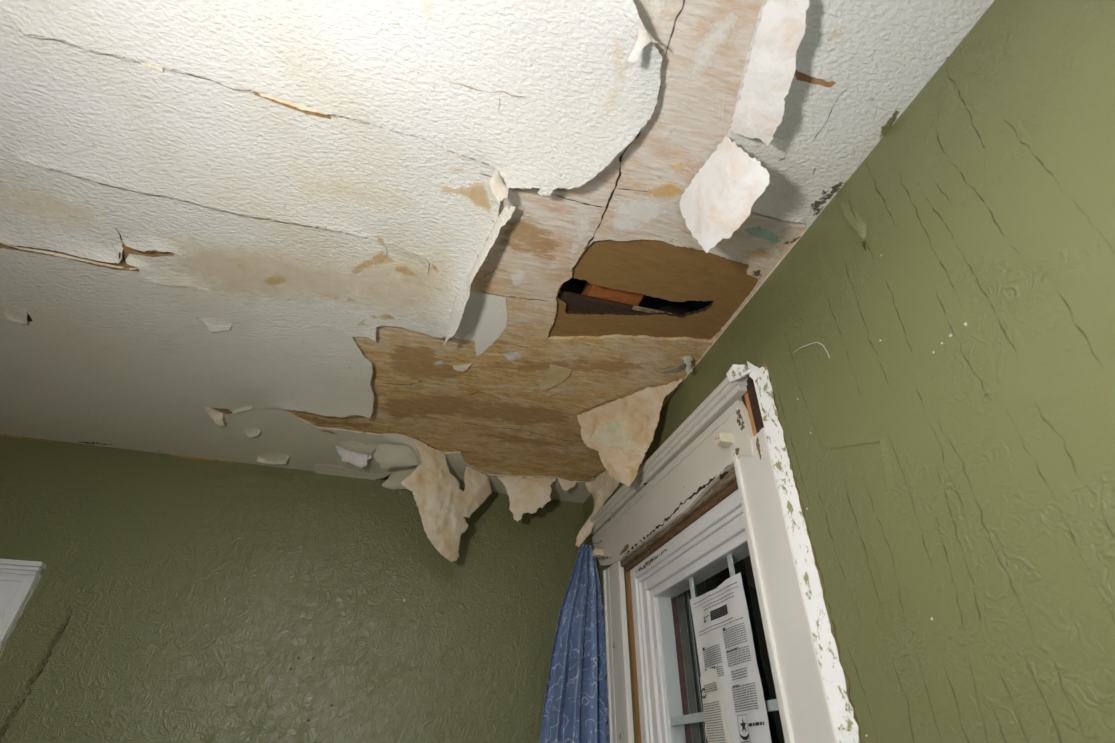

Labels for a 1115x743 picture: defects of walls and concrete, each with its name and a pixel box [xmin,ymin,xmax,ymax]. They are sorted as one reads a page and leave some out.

crack [11,19,258,94]
crack [116,229,171,261]
peeling [0,0,810,490]
crack [444,80,529,107]
crack [555,0,685,270]
spalling [599,448,739,560]
peeling [752,366,859,743]
crack [770,336,904,743]
crack [827,118,1115,743]